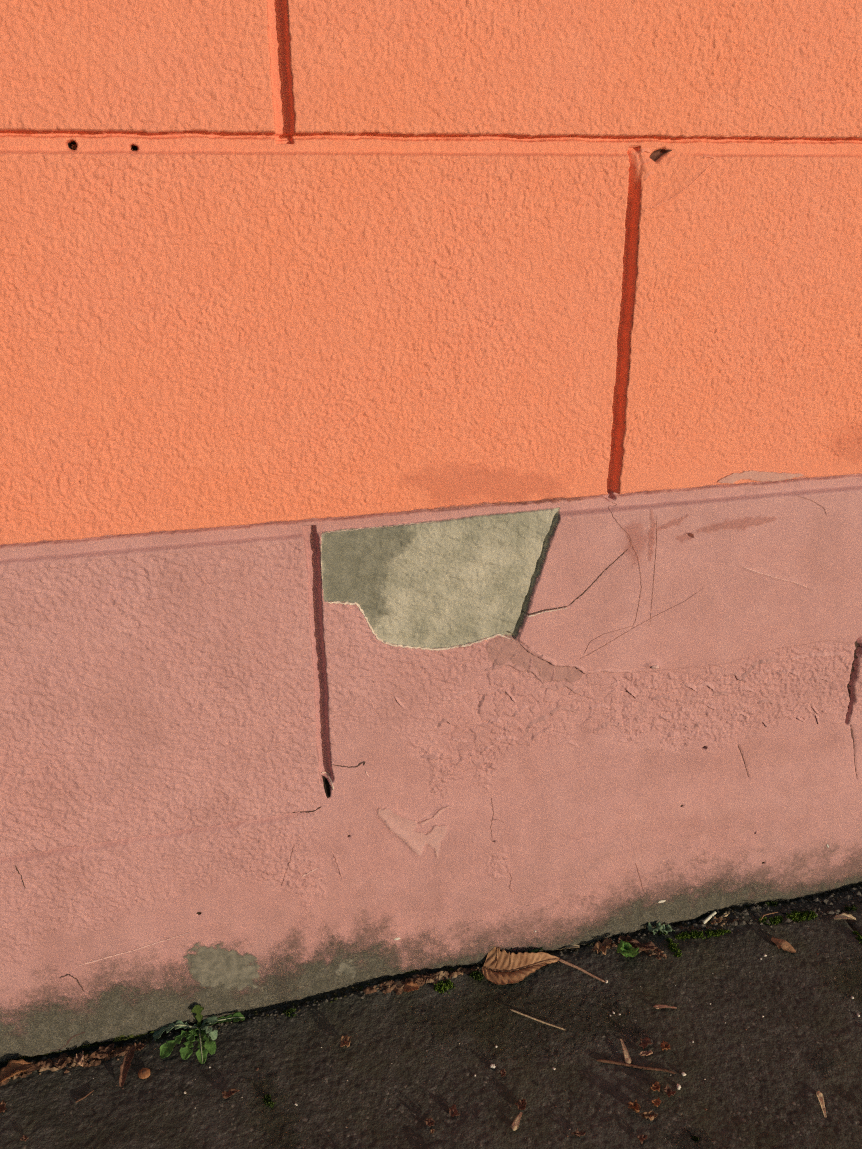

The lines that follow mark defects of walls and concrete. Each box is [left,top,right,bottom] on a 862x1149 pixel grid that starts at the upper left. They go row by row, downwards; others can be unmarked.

spalling [634,148,672,181]
spalling [321,508,701,751]
crack [523,497,702,656]
crack [846,641,861,774]
water stain [231,858,862,1005]